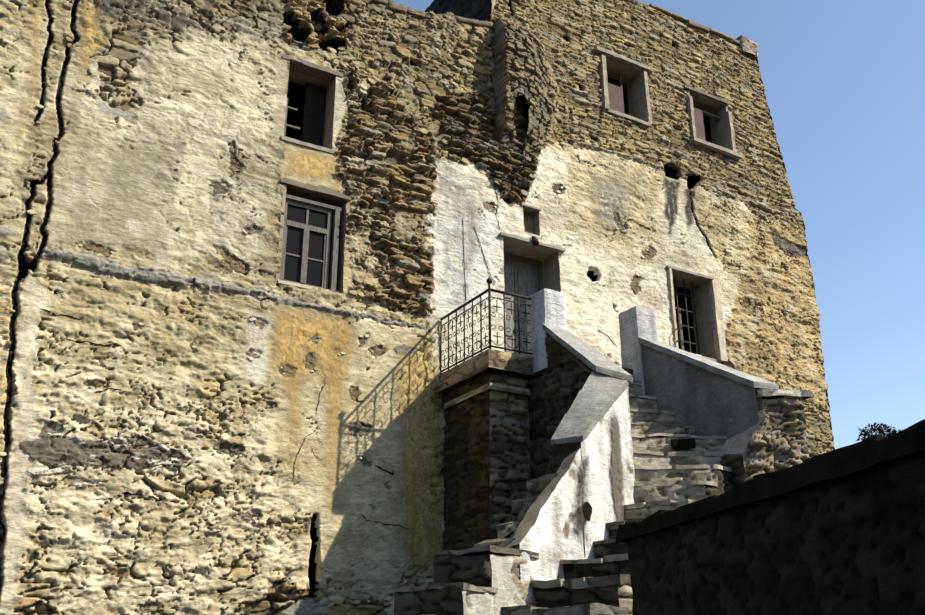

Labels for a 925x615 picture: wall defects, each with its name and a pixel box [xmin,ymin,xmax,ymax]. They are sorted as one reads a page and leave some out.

flaking render [281,0,537,313]
water stain [664,179,695,233]
crack [0,0,80,593]
crack [42,286,121,347]
spalling [36,421,70,442]